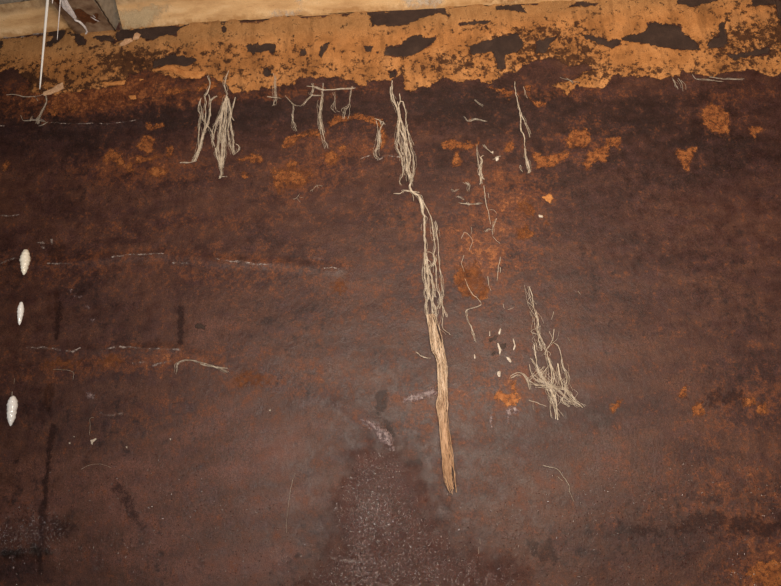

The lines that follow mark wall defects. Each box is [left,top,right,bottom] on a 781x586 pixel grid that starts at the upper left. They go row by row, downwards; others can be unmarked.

peeling [0,0,781,116]
peeling [103,122,174,178]
peeling [282,129,320,148]
peeling [328,114,387,149]
damp [403,387,437,402]
damp [0,419,781,586]